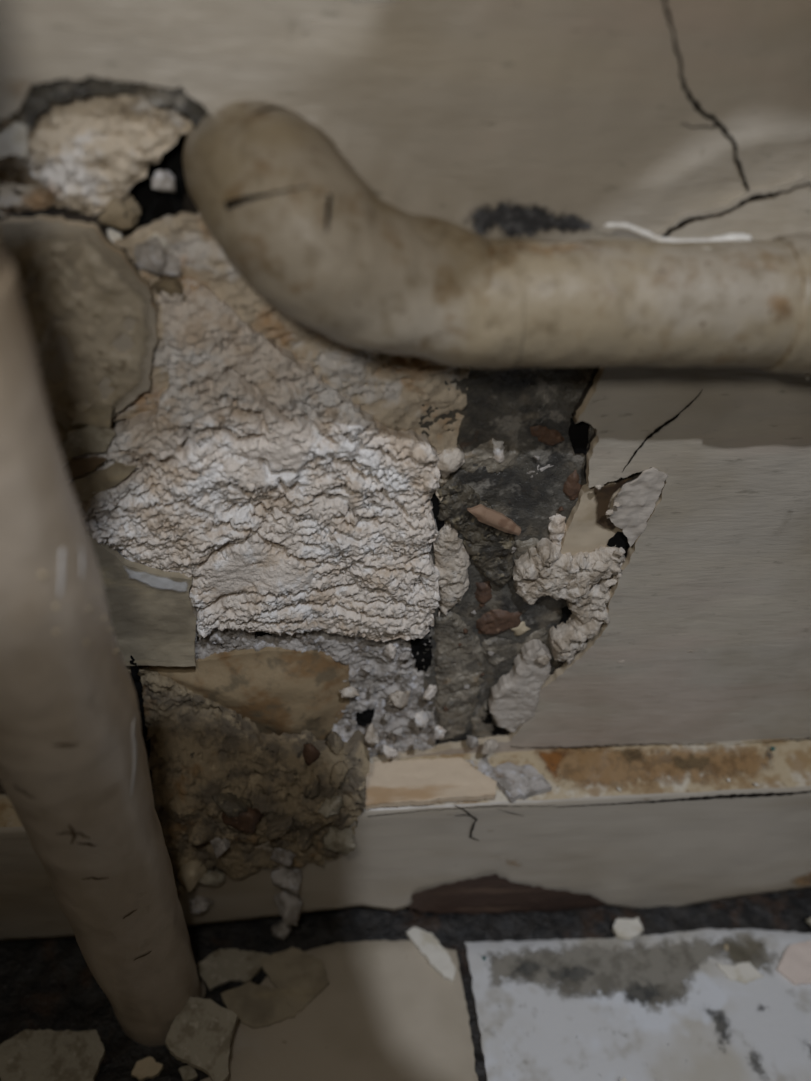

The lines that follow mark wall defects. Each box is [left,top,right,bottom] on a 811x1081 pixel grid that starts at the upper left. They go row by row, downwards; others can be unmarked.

crack [661,0,811,237]
spalling [0,76,668,760]
crack [622,389,703,472]
leakage [490,938,776,1009]